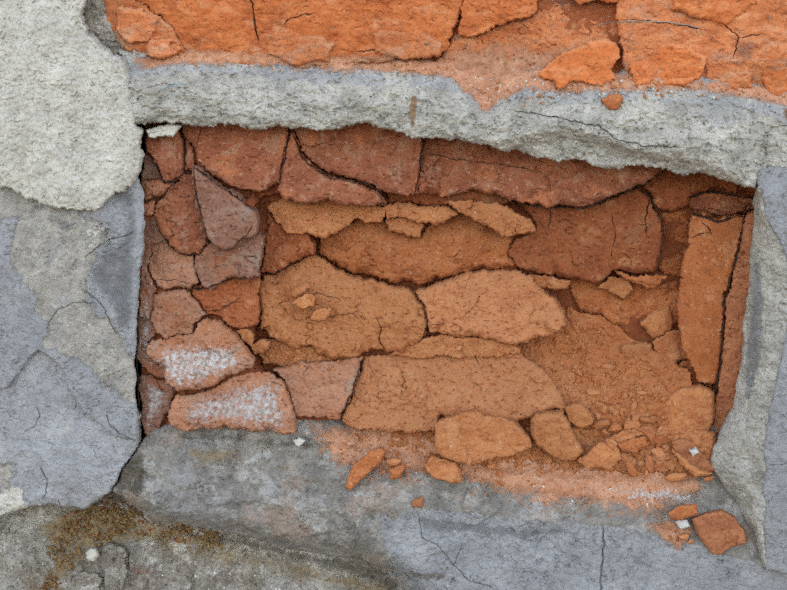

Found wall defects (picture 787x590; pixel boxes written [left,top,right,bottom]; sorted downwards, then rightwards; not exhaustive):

peeling [103,0,622,90]
peeling [628,43,787,96]
peeling [671,0,756,26]
spalling [0,121,787,568]